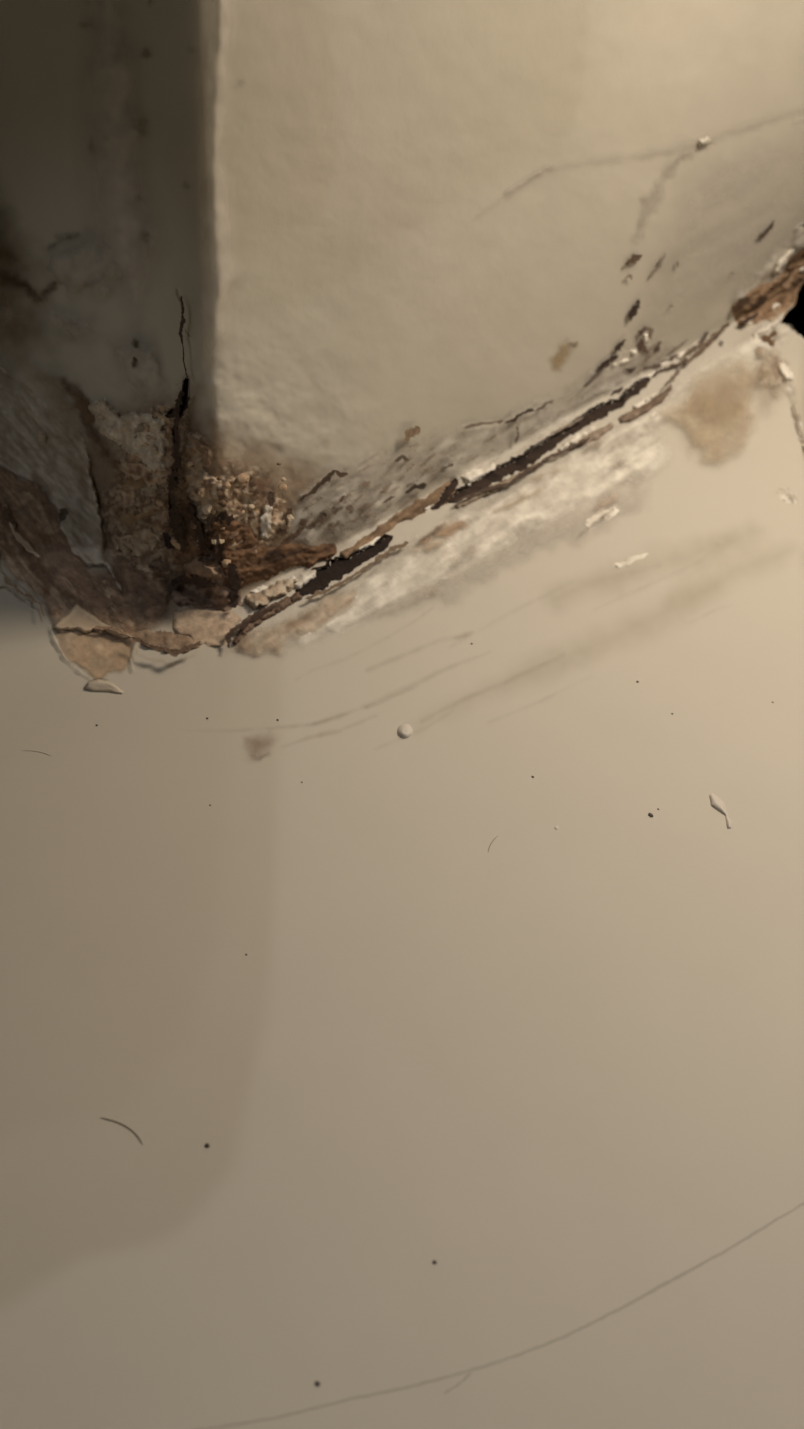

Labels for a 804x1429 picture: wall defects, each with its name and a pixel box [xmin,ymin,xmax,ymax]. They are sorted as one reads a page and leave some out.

crack [162,296,212,556]
flaking render [0,247,804,694]